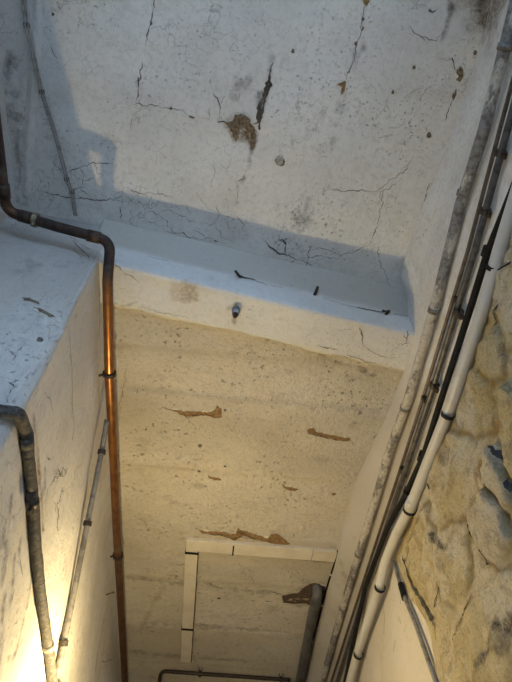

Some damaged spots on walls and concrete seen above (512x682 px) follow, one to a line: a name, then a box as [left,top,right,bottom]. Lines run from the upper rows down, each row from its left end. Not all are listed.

crack [346,9,365,79]
crack [136,62,225,119]
crack [254,63,273,130]
spalling [442,58,465,120]
spalling [218,112,257,150]
crack [38,161,243,242]
crack [265,158,413,285]